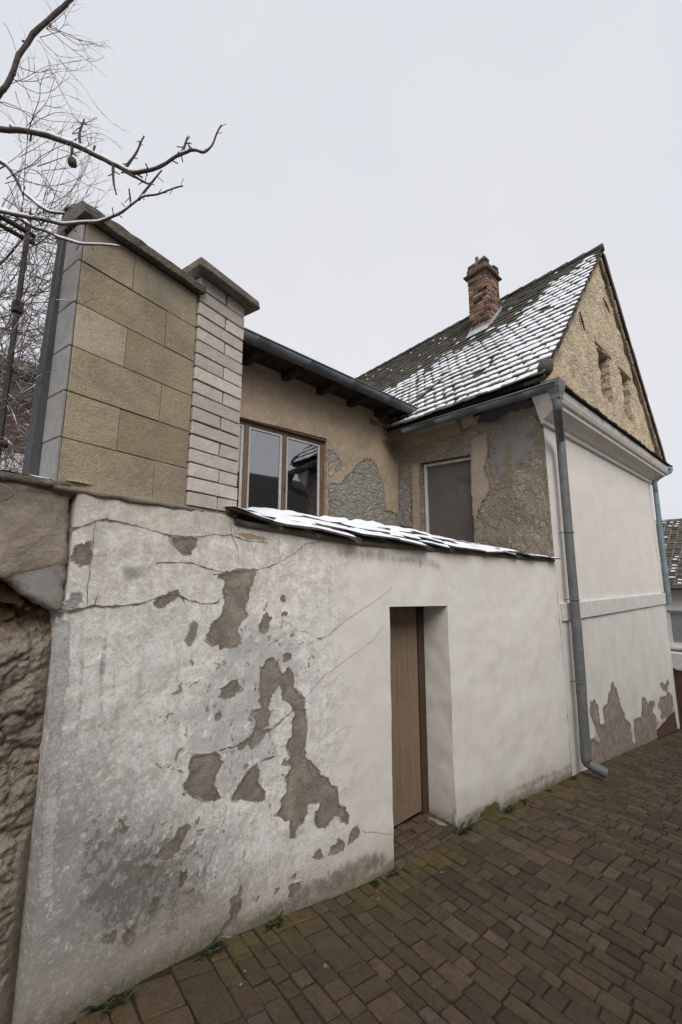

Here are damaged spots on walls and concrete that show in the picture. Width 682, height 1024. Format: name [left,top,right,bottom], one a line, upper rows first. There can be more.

spalling [328,448,412,528]
peeling [71,541,93,568]
crack [3,515,315,613]
crack [219,560,405,763]
peeling [0,583,83,899]
peeling [100,567,360,947]
peeling [590,679,673,764]